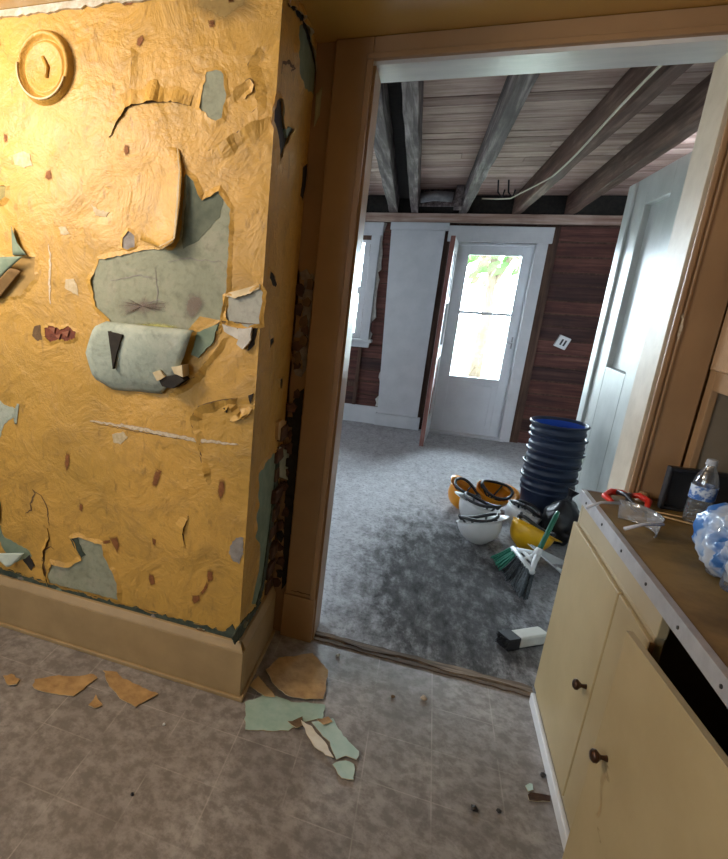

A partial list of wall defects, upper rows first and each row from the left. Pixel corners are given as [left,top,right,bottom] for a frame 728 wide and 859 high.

peeling [195,66,231,127]
spalling [274,99,293,157]
peeling [288,0,322,126]
peeling [0,226,39,302]
peeling [32,147,277,397]
spalling [0,267,315,644]